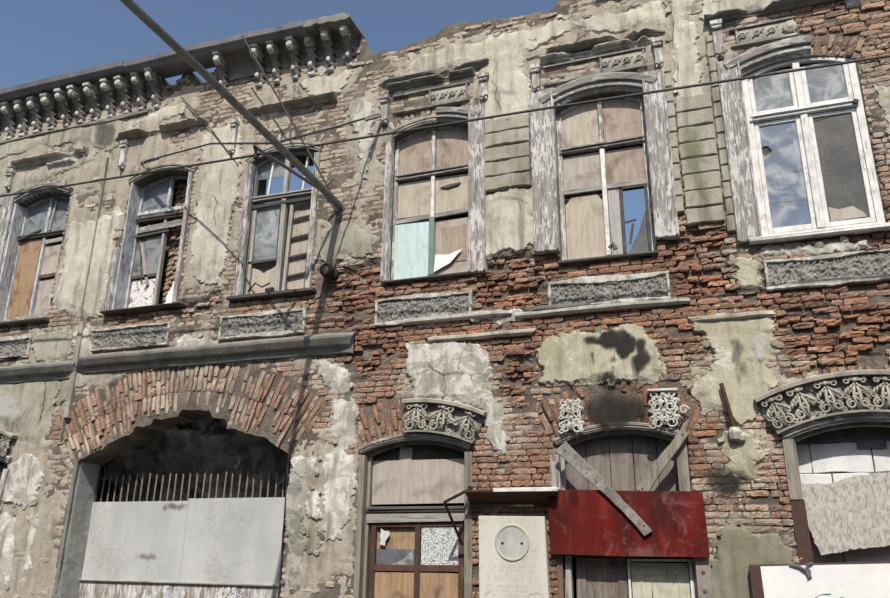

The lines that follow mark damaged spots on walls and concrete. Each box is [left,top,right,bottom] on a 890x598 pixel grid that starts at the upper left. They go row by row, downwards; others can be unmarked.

flaking render [408,0,774,121]
flaking render [872,84,890,142]
spalling [654,227,872,301]
flaking render [0,367,166,598]
flaking render [280,221,667,598]
flaking render [687,302,890,482]